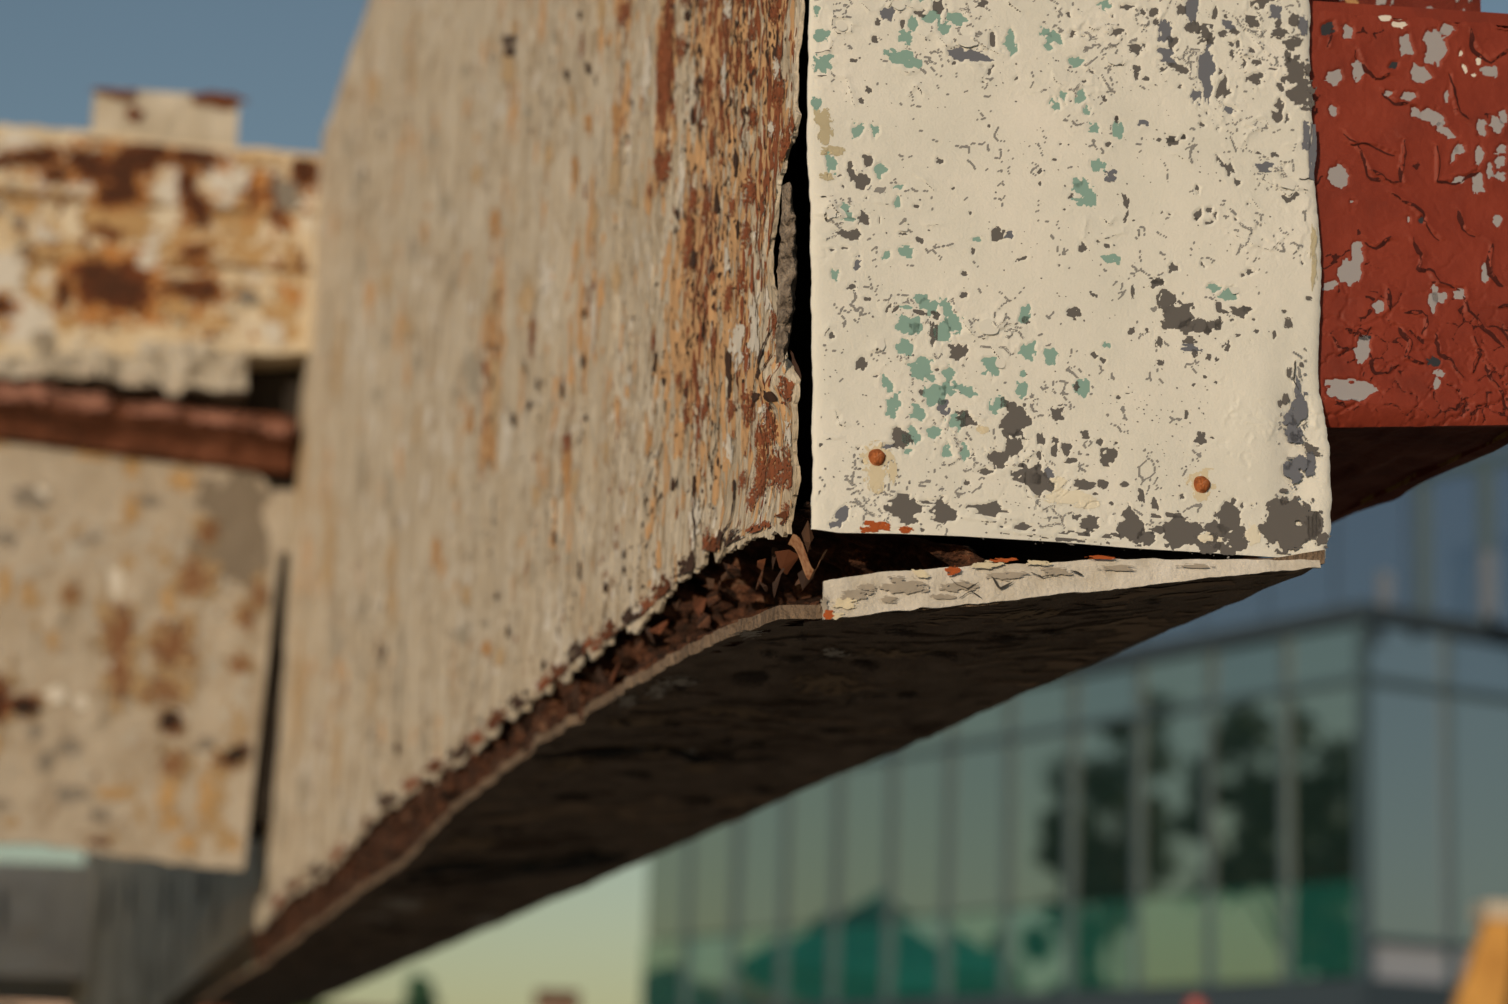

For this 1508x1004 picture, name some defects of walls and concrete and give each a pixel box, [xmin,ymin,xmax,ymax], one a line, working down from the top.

corrosion [655,0,779,115]
peeling [1107,0,1317,123]
corrosion [0,88,238,332]
crack [724,327,801,410]
peeling [913,309,969,361]
peeling [1149,262,1255,352]
corrosion [375,169,795,809]
corrosion [859,440,899,494]
peeling [883,493,1032,530]
peeling [977,398,1118,498]
peeling [1055,488,1331,555]
corrosion [101,603,198,701]